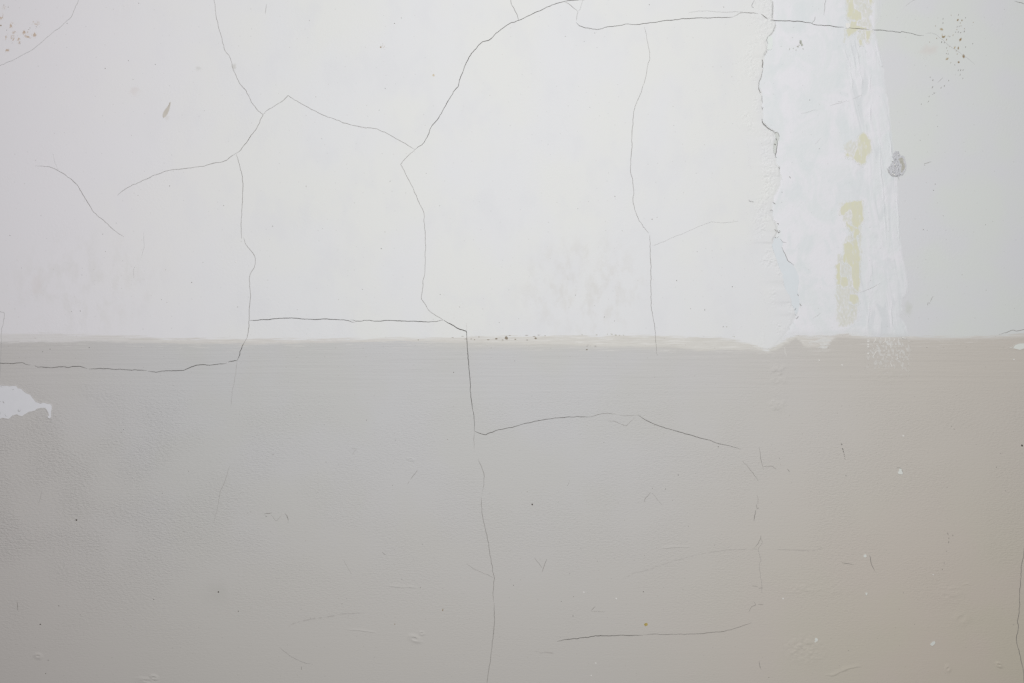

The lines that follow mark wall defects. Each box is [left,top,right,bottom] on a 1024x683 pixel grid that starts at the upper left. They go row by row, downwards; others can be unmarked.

crack [0,0,972,448]
peeling [0,384,53,420]
crack [561,449,776,641]